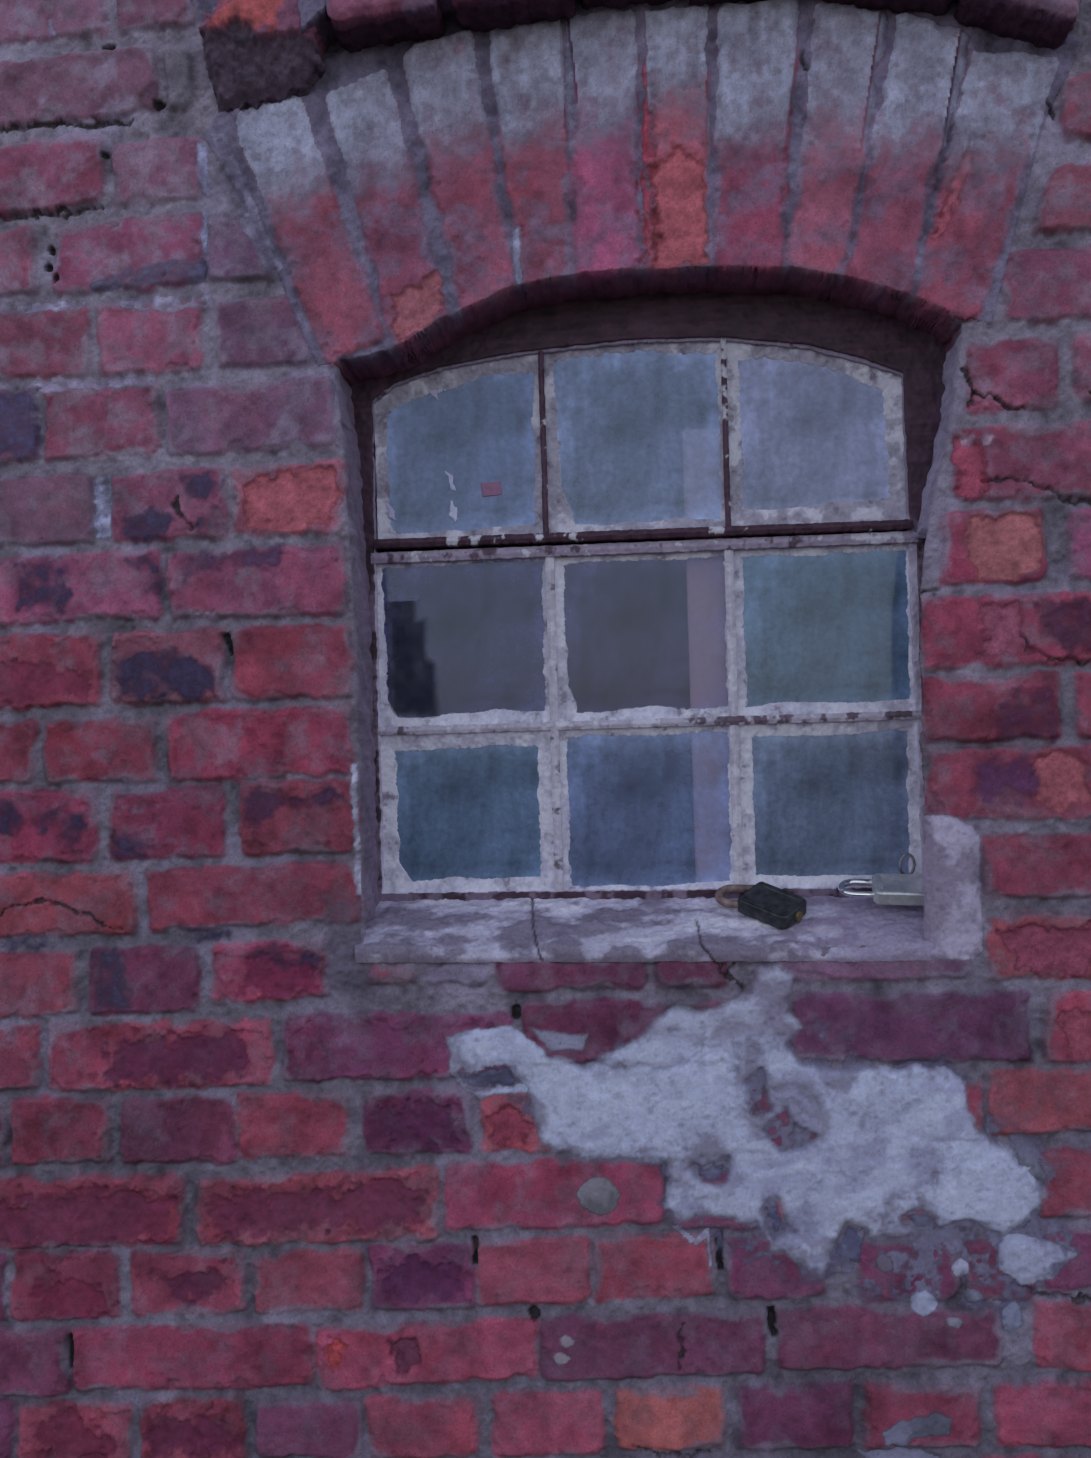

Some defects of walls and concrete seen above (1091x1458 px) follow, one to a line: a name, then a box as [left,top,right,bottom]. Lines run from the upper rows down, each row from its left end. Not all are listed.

spalling [636,32,709,269]
spalling [391,270,444,342]
crack [960,368,1023,411]
crack [987,477,1091,505]
crack [0,898,123,930]
peeling [446,965,1077,1336]